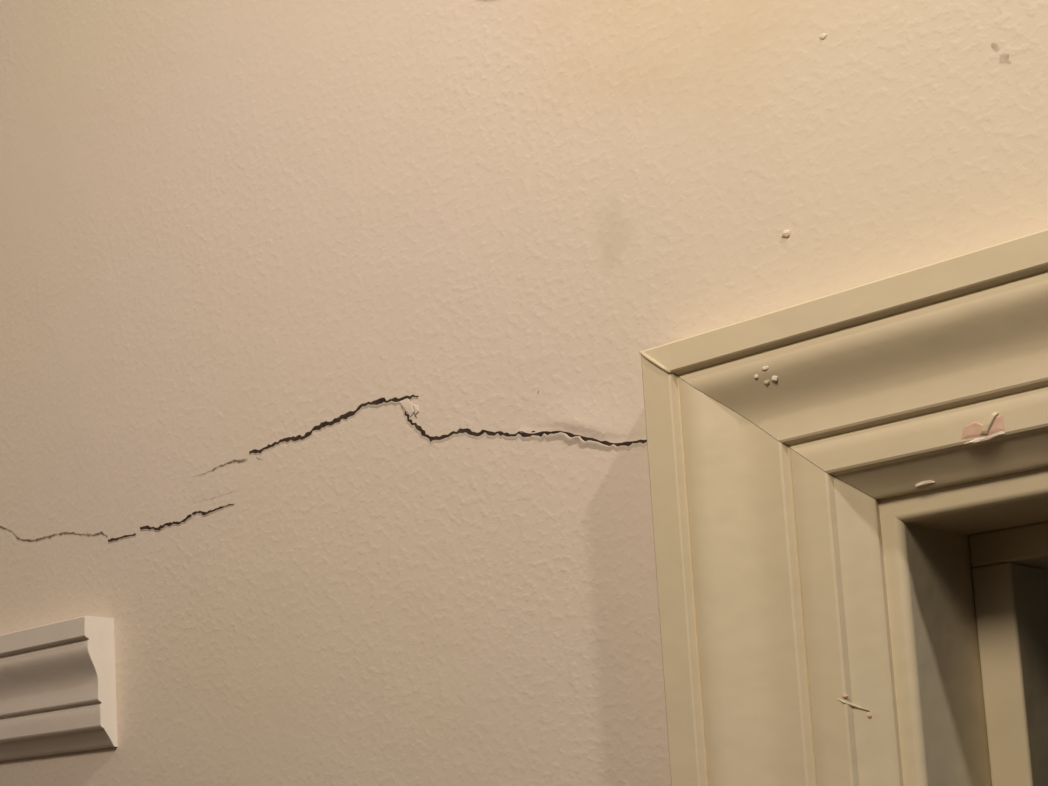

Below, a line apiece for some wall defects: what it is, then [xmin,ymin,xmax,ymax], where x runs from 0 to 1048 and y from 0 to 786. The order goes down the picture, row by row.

crack [212,379,647,471]
crack [0,504,234,544]